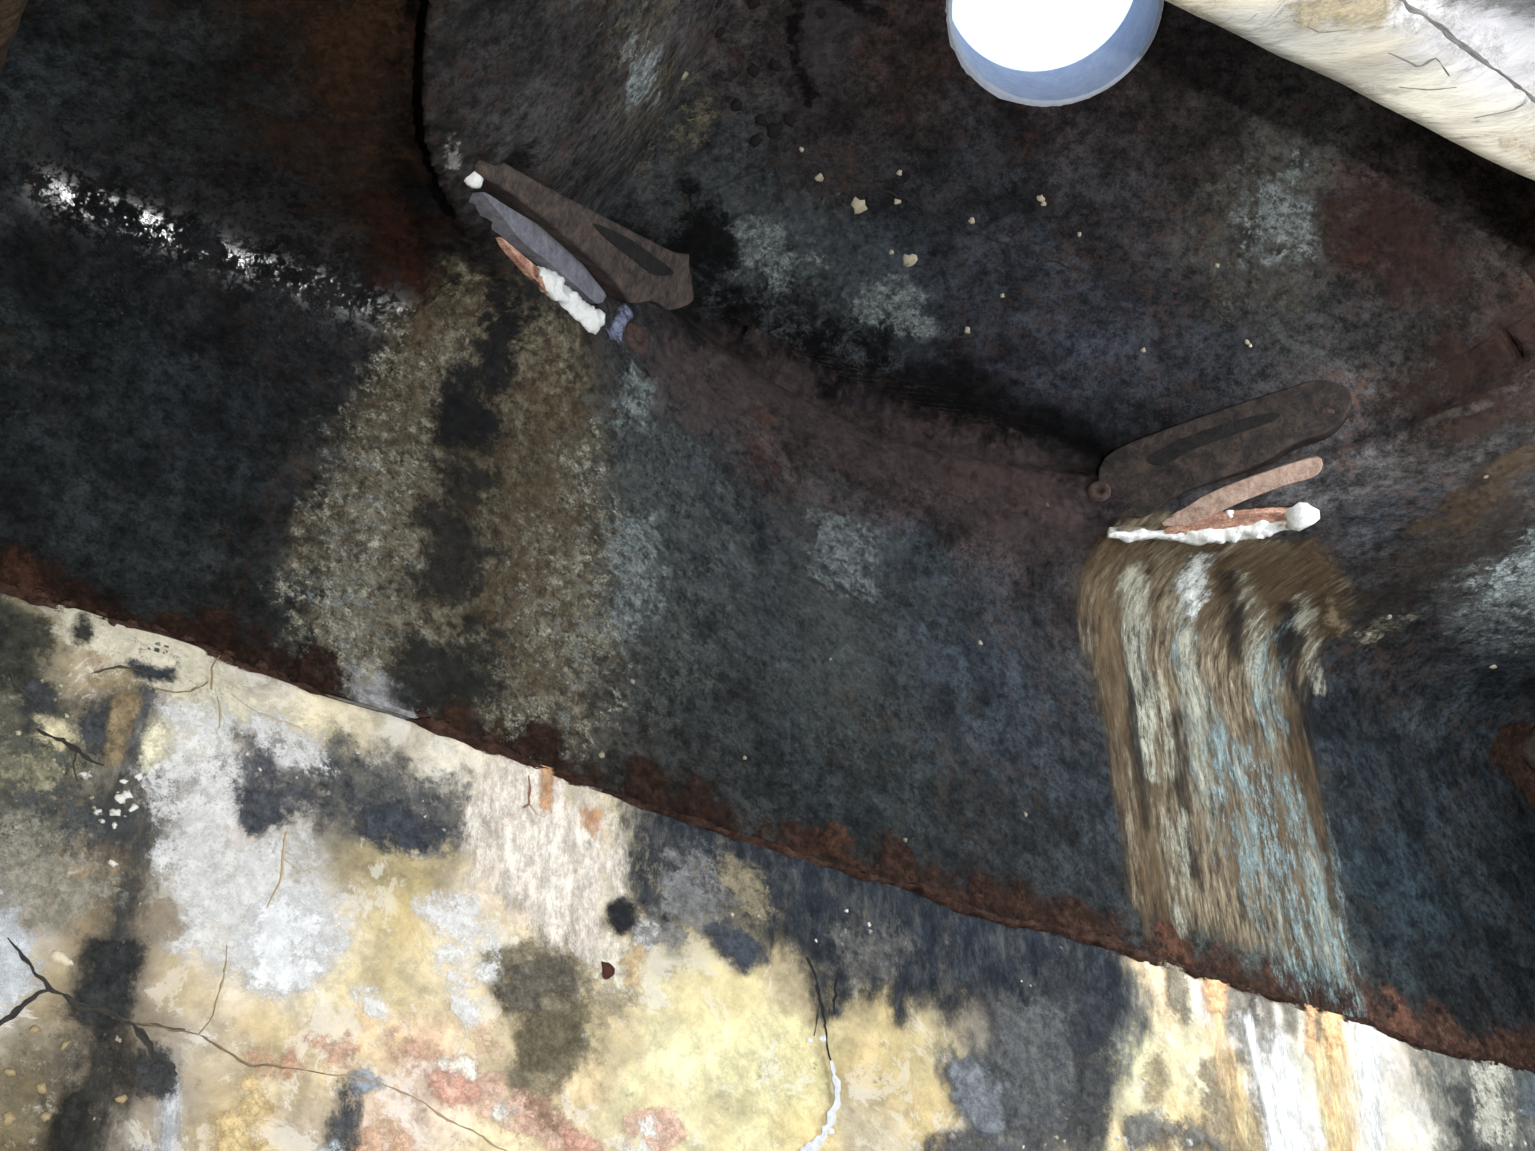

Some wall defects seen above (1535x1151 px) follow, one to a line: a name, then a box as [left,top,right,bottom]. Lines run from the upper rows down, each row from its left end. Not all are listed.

crack [1389,0,1535,119]
damp [270,255,753,762]
crack [8,668,104,781]
corrosion [0,543,354,700]
crack [156,655,304,729]
crack [267,831,312,907]
corrosion [414,694,762,839]
damp [0,510,1388,1151]
corrosion [1306,543,1352,638]
crack [0,938,507,1151]
crack [800,957,841,1151]
corrosion [1141,919,1535,1151]